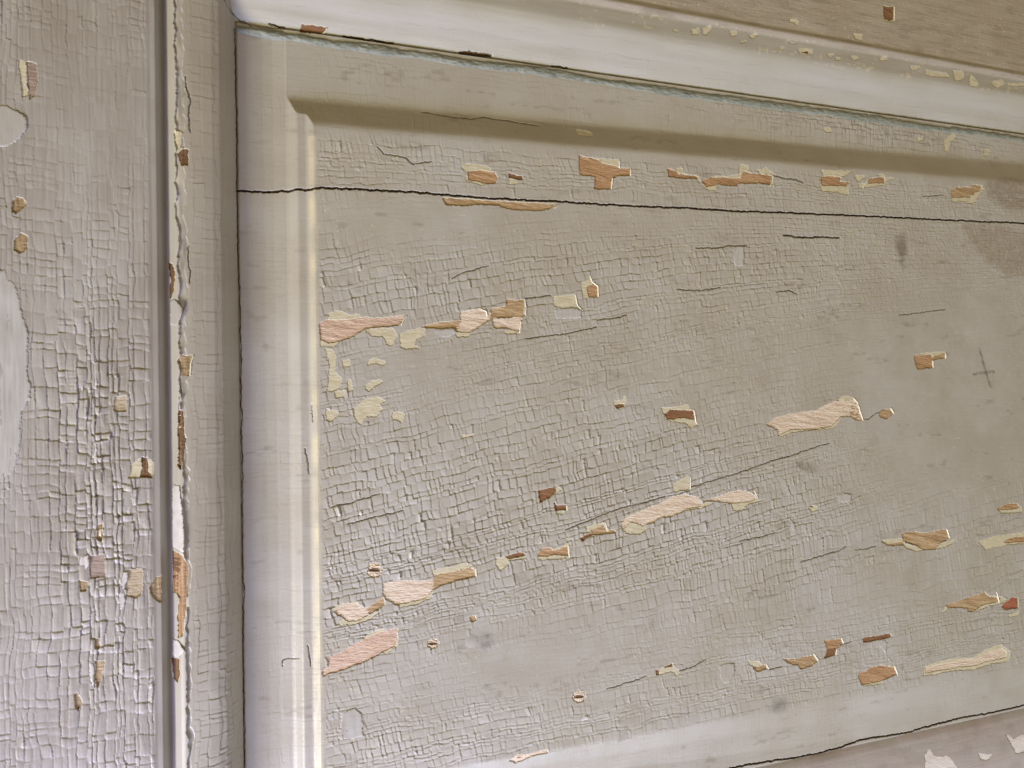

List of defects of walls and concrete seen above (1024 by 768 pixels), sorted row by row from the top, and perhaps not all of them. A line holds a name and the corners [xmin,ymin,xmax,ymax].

peeling [461,164,522,185]
peeling [579,155,631,190]
peeling [668,164,775,191]
peeling [0,269,31,478]
peeling [319,299,526,425]
crack [224,0,1024,768]
peeling [766,396,864,437]
peeling [495,476,762,571]
peeling [118,485,189,681]
peeling [322,563,477,676]
peeling [858,633,898,686]
peeling [942,591,1019,618]